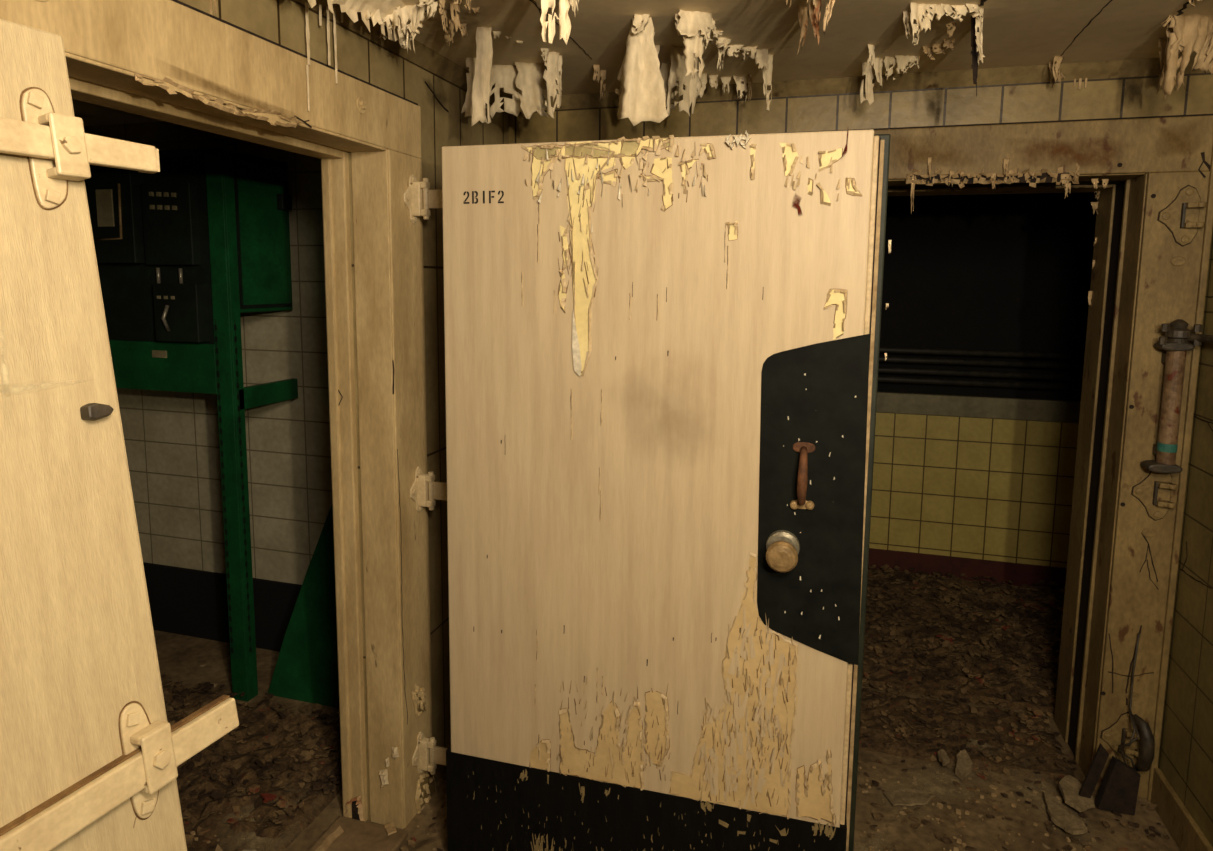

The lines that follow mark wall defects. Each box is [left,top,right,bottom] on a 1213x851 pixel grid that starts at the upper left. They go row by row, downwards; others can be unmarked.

peeling [308,0,579,126]
peeling [786,0,835,55]
peeling [860,2,985,105]
peeling [1156,0,1213,101]
peeling [521,9,774,376]
peeling [780,143,862,206]
peeling [906,157,1109,214]
peeling [824,289,848,340]
peeling [467,553,836,851]